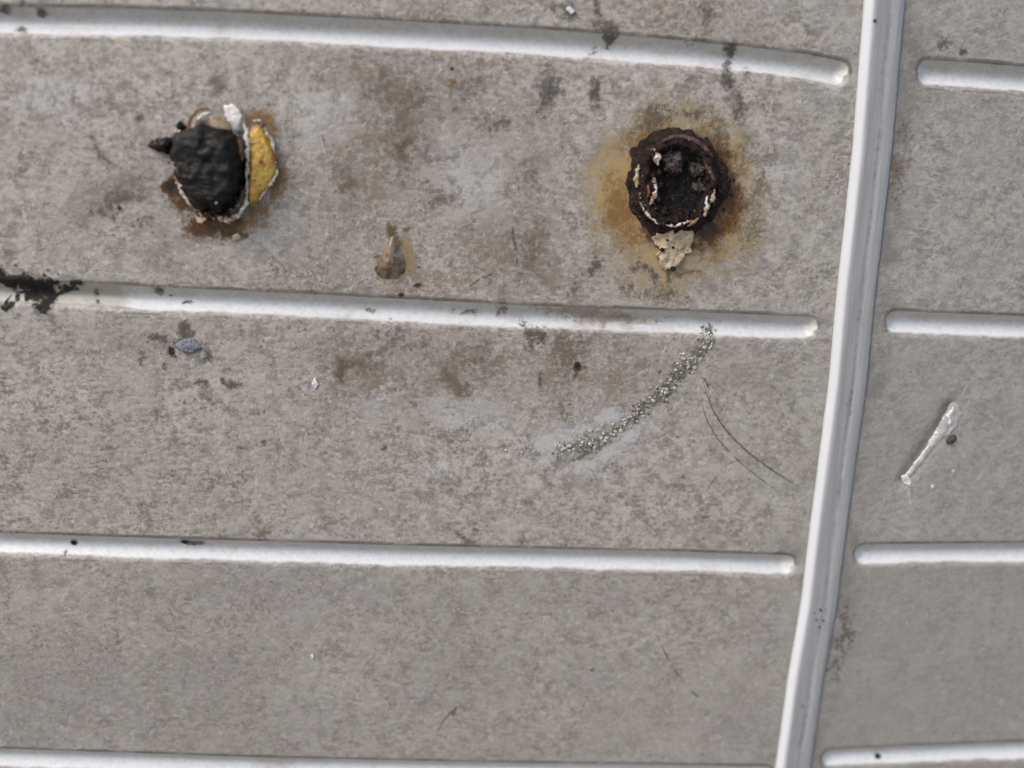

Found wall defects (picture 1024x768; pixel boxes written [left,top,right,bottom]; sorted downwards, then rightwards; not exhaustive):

corrosion [241,110,278,132]
corrosion [160,157,294,245]
corrosion [579,101,765,301]
damp [0,264,100,314]
crack [701,377,797,491]